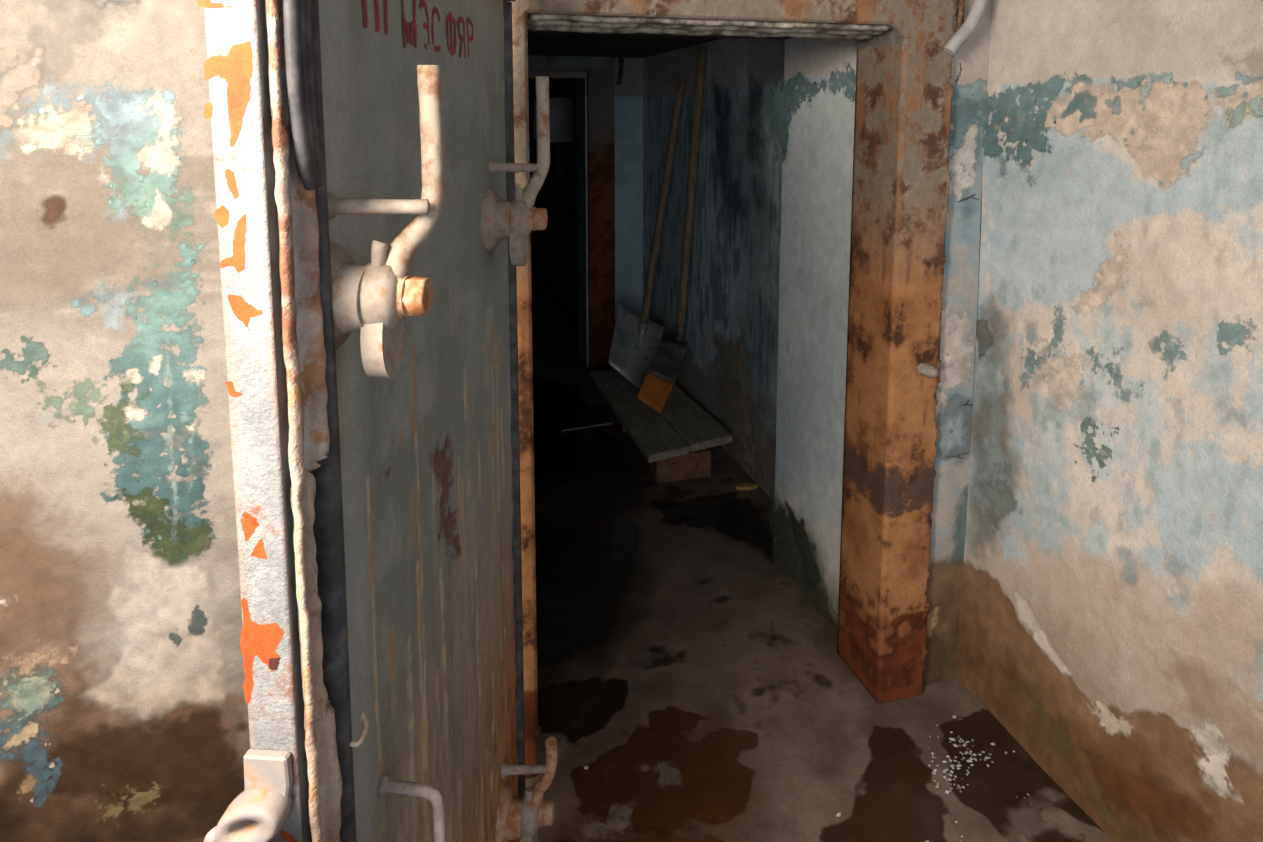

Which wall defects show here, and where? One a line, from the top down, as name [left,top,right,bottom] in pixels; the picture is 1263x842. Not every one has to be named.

peeling [137,88,183,177]
peeling [203,41,253,148]
peeling [1035,73,1263,189]
peeling [214,169,246,273]
peeling [227,295,263,330]
water stain [976,318,993,358]
peeling [120,355,162,433]
water stain [165,401,195,544]
peeling [0,639,78,749]
water stain [0,507,245,842]
water stain [923,469,1263,842]
peeling [1186,721,1243,801]